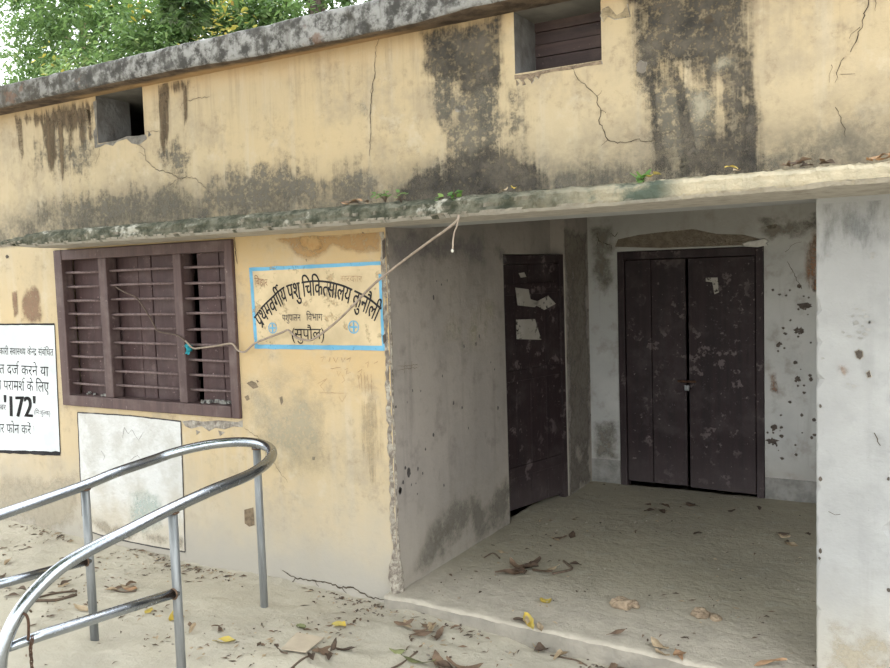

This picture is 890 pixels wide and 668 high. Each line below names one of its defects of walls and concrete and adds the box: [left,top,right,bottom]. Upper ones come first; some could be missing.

crack [830,0,876,82]
water stain [16,103,93,178]
water stain [158,81,190,173]
crack [368,40,379,155]
water stain [398,15,542,201]
crack [573,69,709,145]
water stain [555,0,776,189]
peeling [614,224,777,248]
rust [806,236,816,291]
peeling [771,283,812,353]
flaking render [379,232,423,594]
peeling [765,414,798,460]